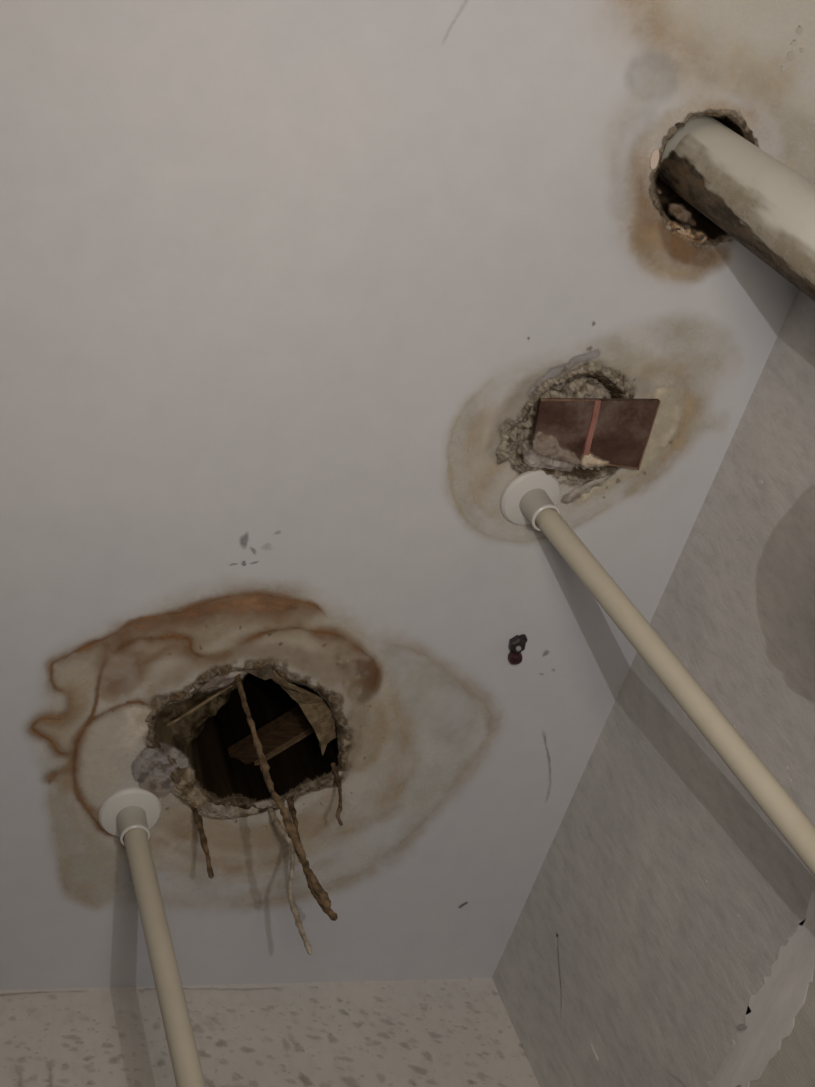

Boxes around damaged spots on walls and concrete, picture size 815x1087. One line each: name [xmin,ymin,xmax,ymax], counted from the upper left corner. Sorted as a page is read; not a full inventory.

leakage [636,197,724,275]
hole [649,110,759,248]
spalling [496,350,634,504]
leakage [621,367,699,473]
rust [29,593,398,841]
hole [132,658,353,820]
rust [149,790,312,876]